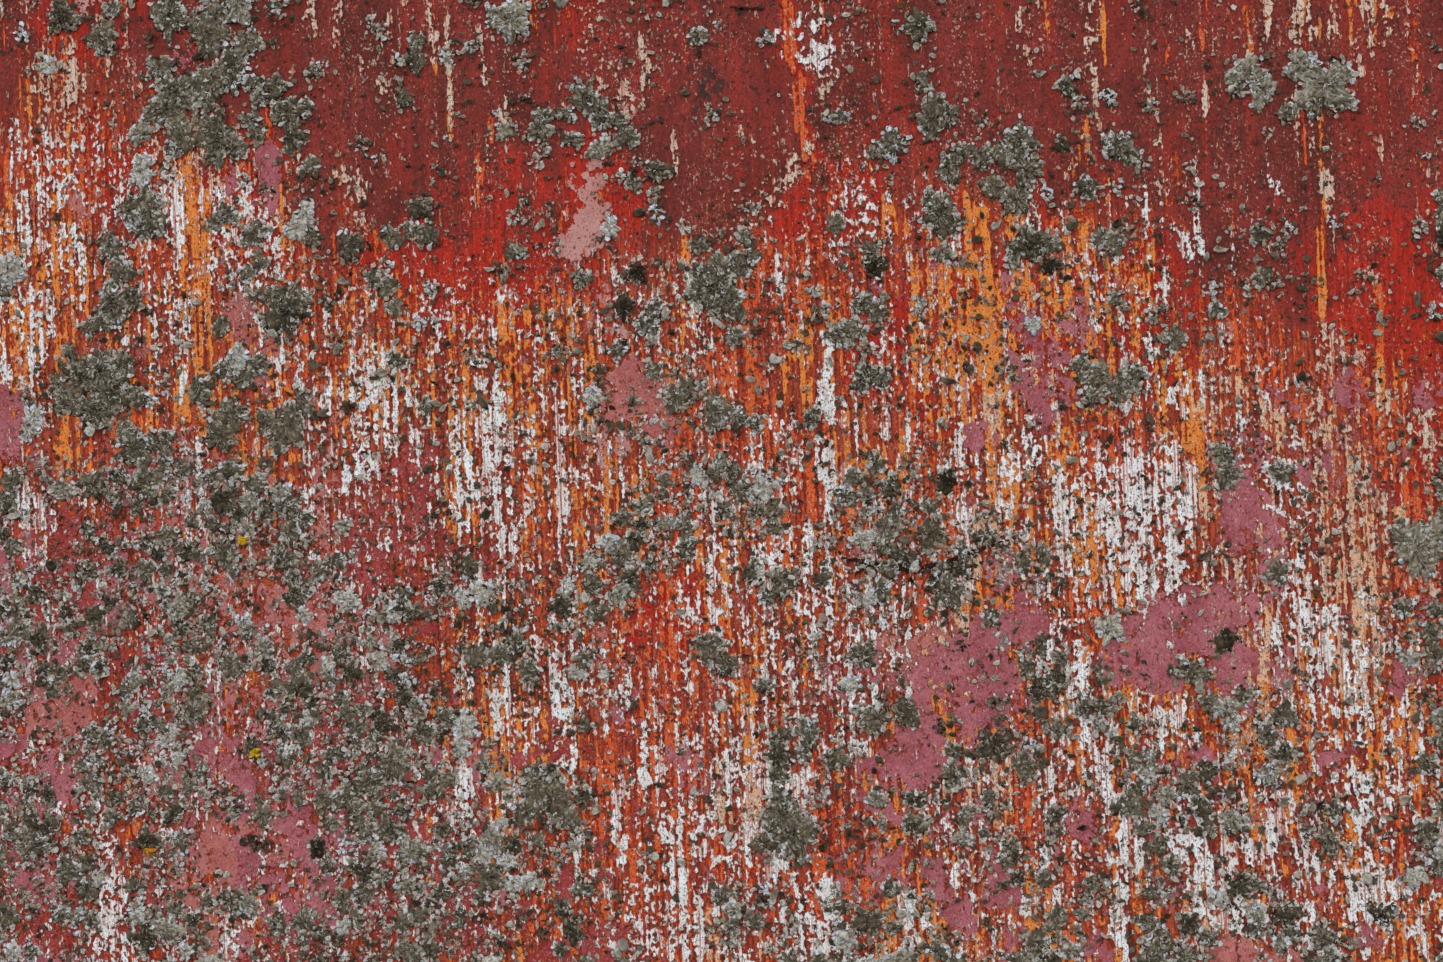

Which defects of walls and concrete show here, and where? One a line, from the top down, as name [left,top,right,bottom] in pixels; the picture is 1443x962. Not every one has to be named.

peeling [571,0,702,124]
peeling [1246,80,1353,256]
peeling [1355,266,1422,317]